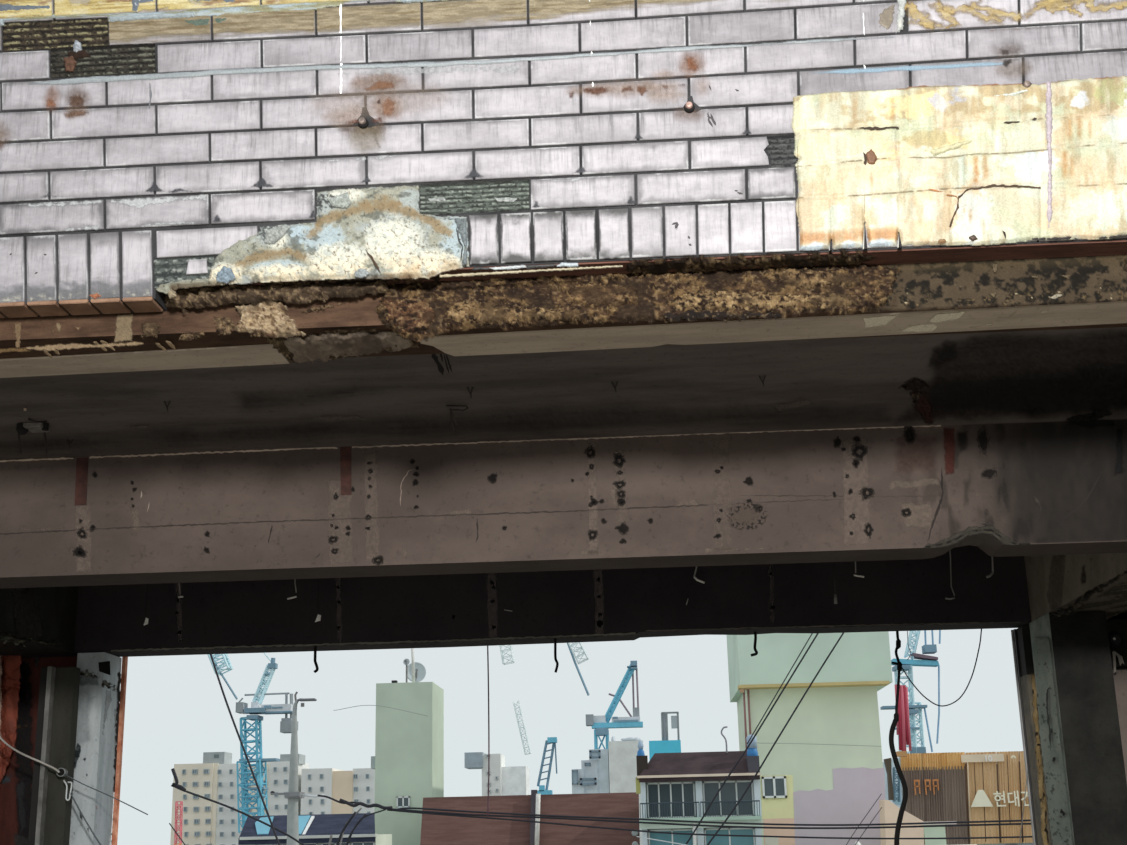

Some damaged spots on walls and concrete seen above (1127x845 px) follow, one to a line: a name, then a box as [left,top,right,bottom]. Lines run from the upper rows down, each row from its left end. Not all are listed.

peeling [0,0,234,78]
rust [47,93,85,117]
rust [345,76,397,133]
rust [570,85,653,97]
peeling [154,76,1127,363]
crack [929,184,1041,227]
rust [900,378,967,474]
leakage [905,333,1127,543]